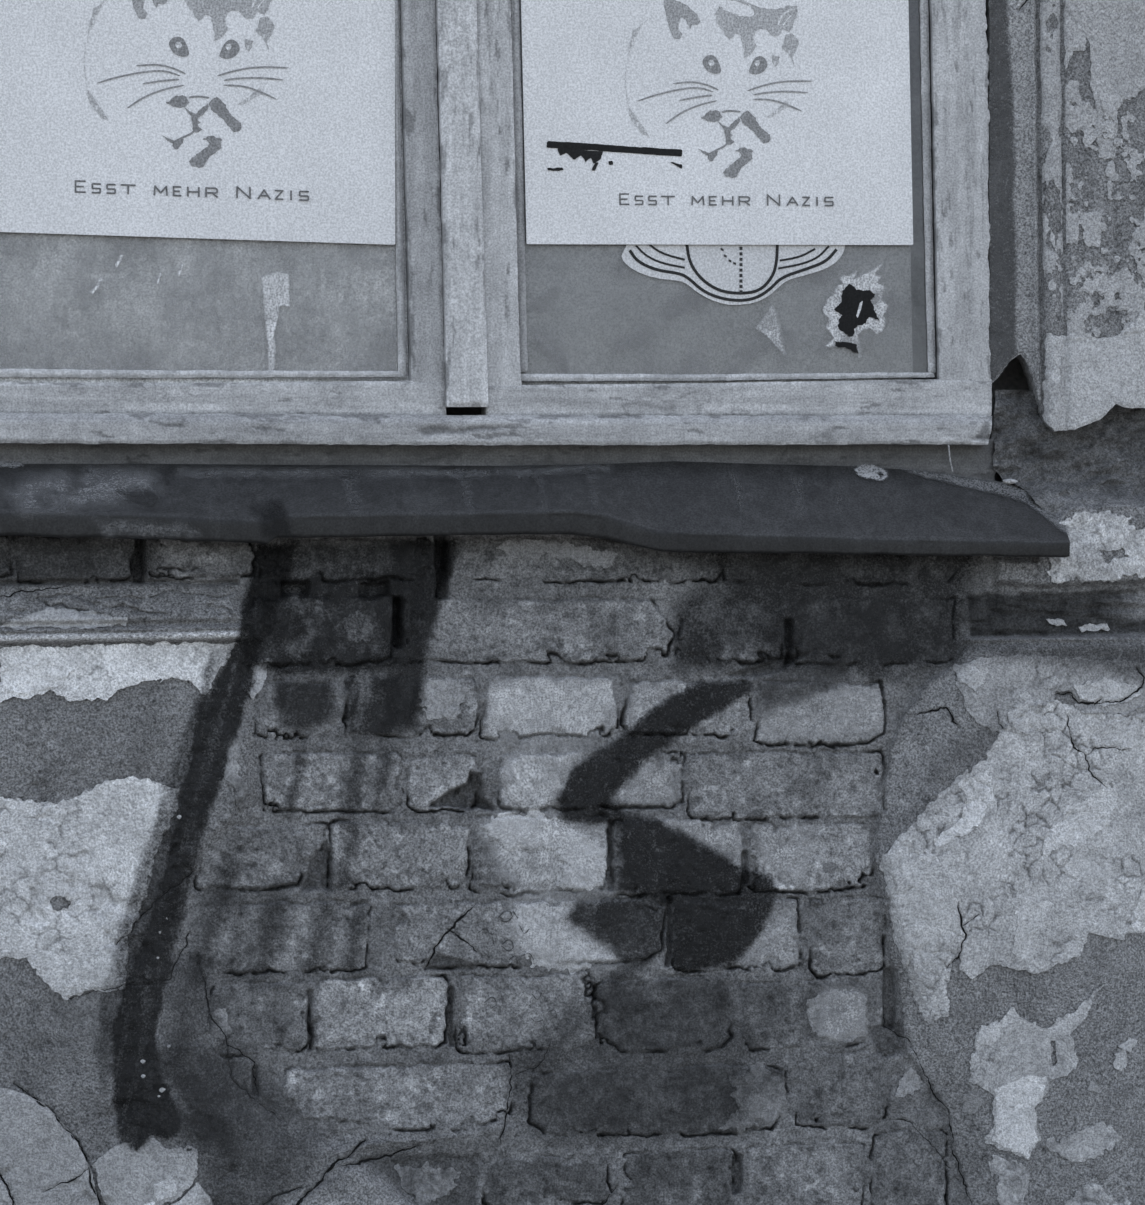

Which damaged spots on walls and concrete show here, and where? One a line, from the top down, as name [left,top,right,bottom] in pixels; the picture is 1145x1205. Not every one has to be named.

peeling [1040,0,1145,431]
peeling [0,653,72,694]
crack [917,653,1145,787]
peeling [143,790,181,826]
peeling [62,937,129,990]
crack [948,901,978,966]
peeling [977,1020,1003,1046]
crack [15,1084,100,1205]
flaking render [0,1088,212,1205]
crack [883,1006,972,1205]
peeling [992,1075,1047,1159]